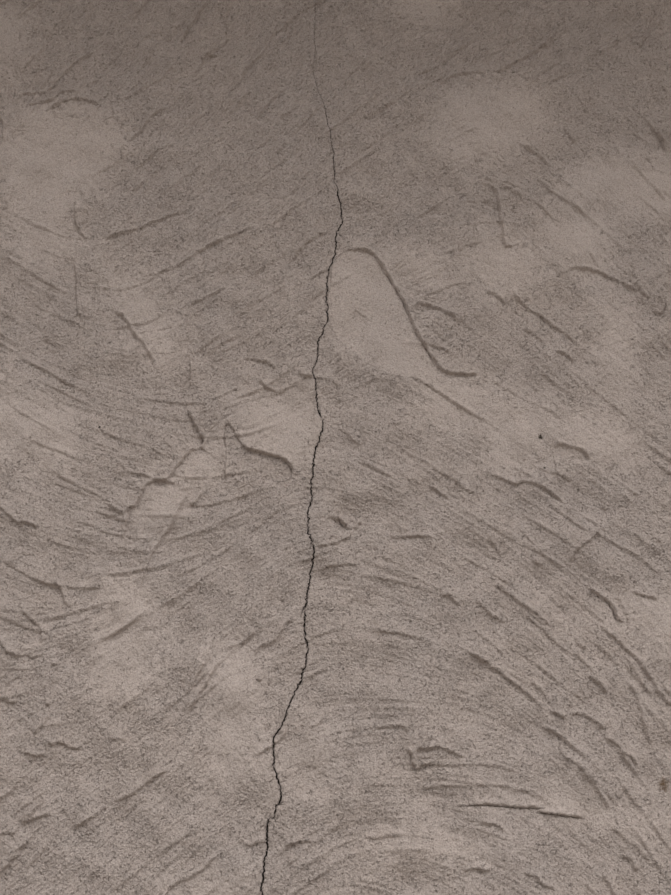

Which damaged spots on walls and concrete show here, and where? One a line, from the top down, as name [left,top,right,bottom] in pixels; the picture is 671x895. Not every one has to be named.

crack [260,25,343,895]